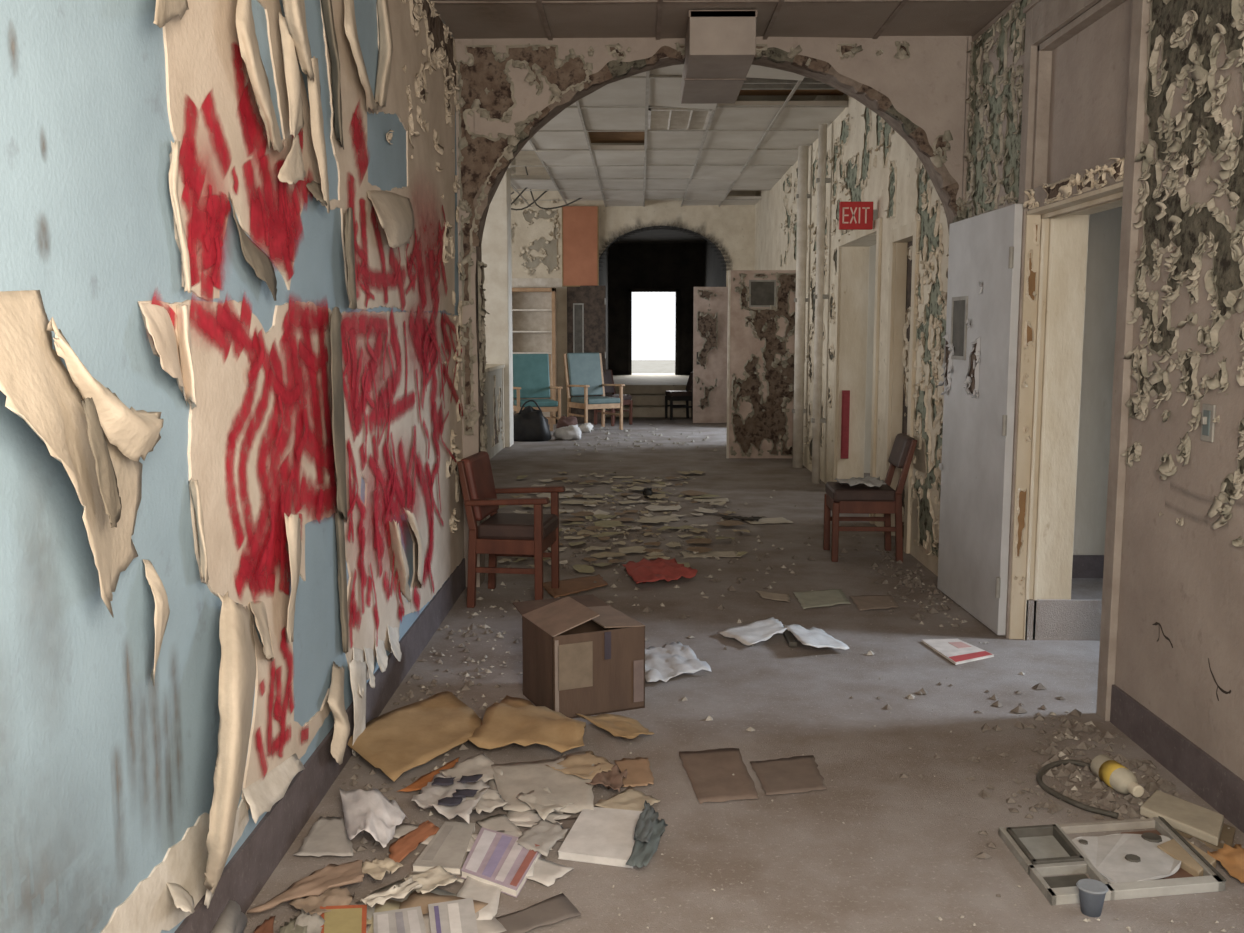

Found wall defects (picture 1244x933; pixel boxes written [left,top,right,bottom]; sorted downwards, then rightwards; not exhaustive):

peeling [0,290,170,685]
peeling [100,0,685,933]
peeling [695,0,1244,560]